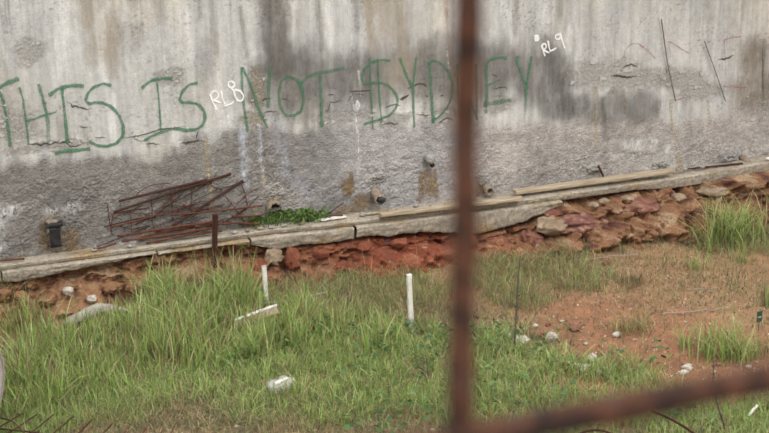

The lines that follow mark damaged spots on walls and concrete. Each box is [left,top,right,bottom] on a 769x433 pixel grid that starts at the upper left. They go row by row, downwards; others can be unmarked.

damp [264,0,383,107]